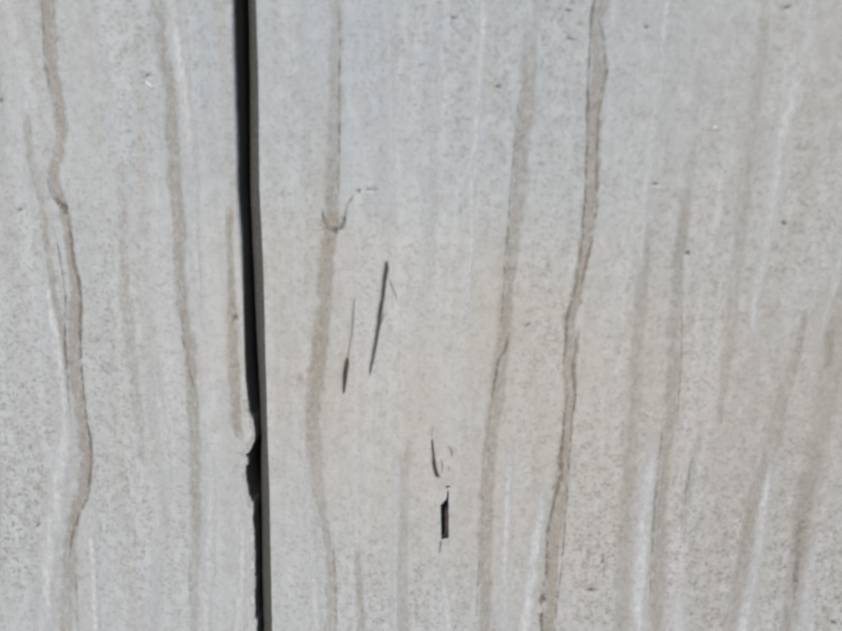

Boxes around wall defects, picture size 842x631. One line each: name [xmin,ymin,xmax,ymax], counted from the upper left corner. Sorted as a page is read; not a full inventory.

crack [370,262,388,374]
crack [342,359,350,393]
crack [431,440,439,477]